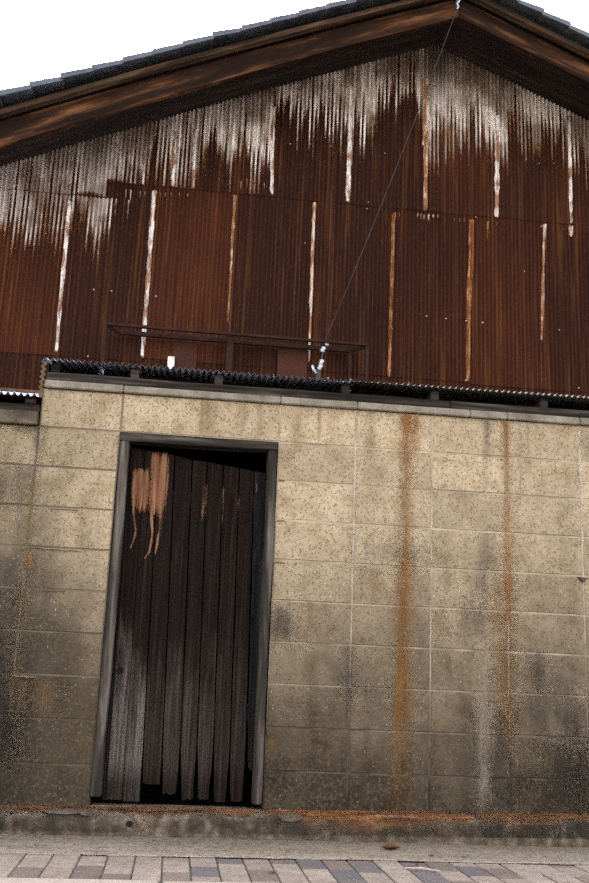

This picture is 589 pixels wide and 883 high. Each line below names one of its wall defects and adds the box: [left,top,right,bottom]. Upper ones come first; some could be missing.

peeling [144,481,164,559]
corrosion [271,809,474,826]